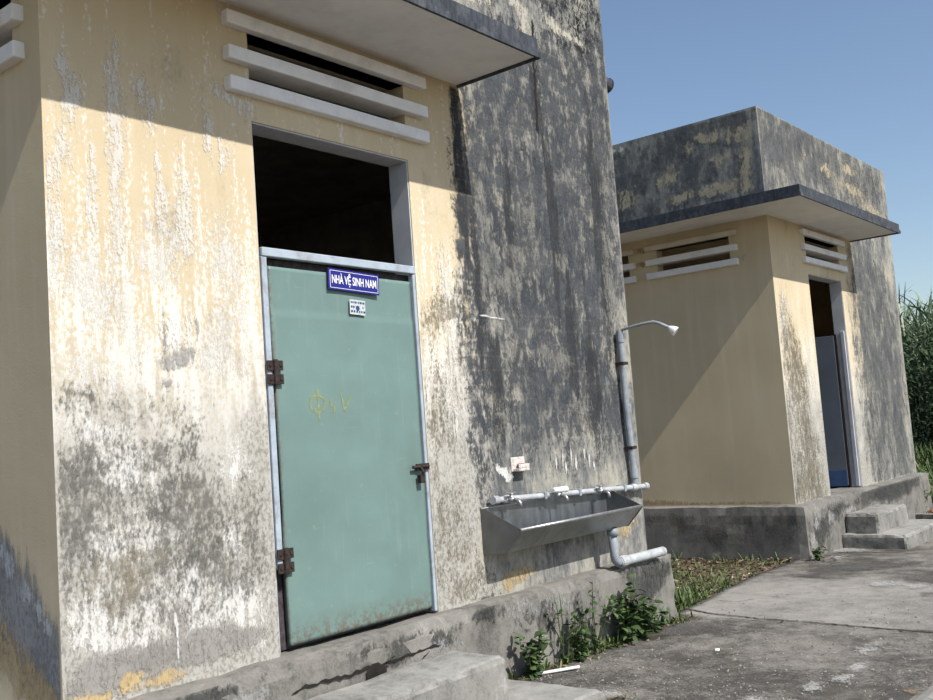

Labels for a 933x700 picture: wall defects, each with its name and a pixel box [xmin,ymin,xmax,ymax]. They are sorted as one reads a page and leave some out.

peeling [46,36,257,396]
leakage [346,0,933,667]
leakage [0,381,278,700]
peeling [61,408,274,657]
crack [292,644,442,695]